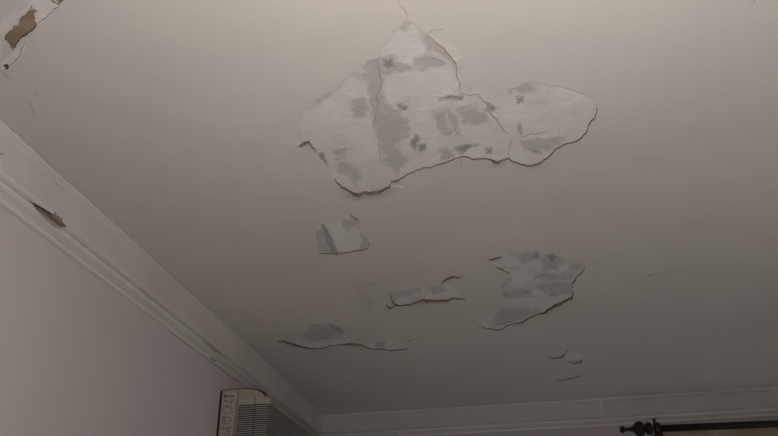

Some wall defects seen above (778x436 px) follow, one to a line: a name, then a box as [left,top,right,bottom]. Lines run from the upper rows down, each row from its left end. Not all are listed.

spalling [0,0,63,80]
peeling [314,213,373,257]
peeling [381,276,465,310]
peeling [276,322,417,353]